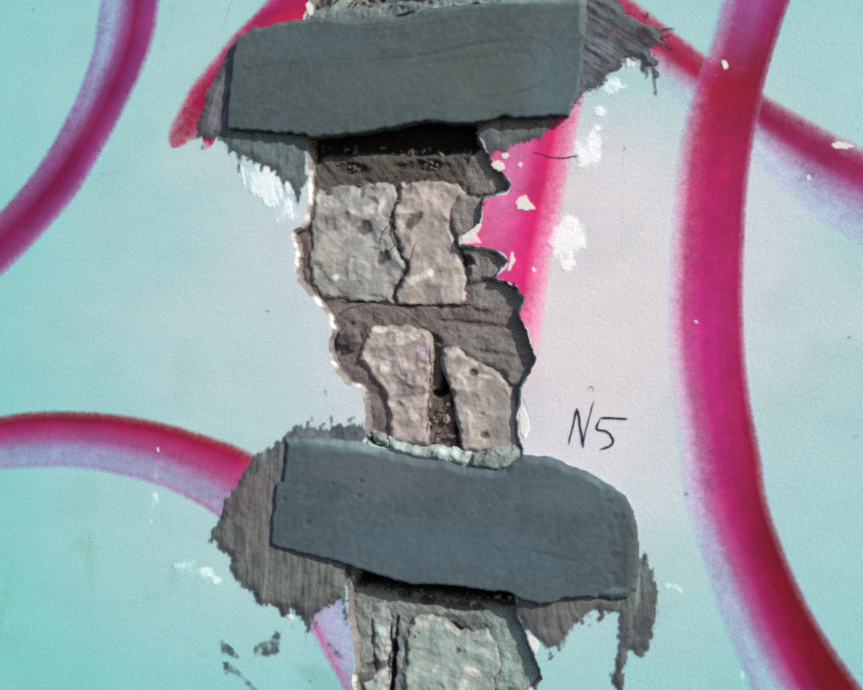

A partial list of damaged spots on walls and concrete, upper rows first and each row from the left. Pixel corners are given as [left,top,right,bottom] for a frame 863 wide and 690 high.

spalling [306,0,492,20]
spalling [299,124,535,467]
spalling [352,569,540,690]